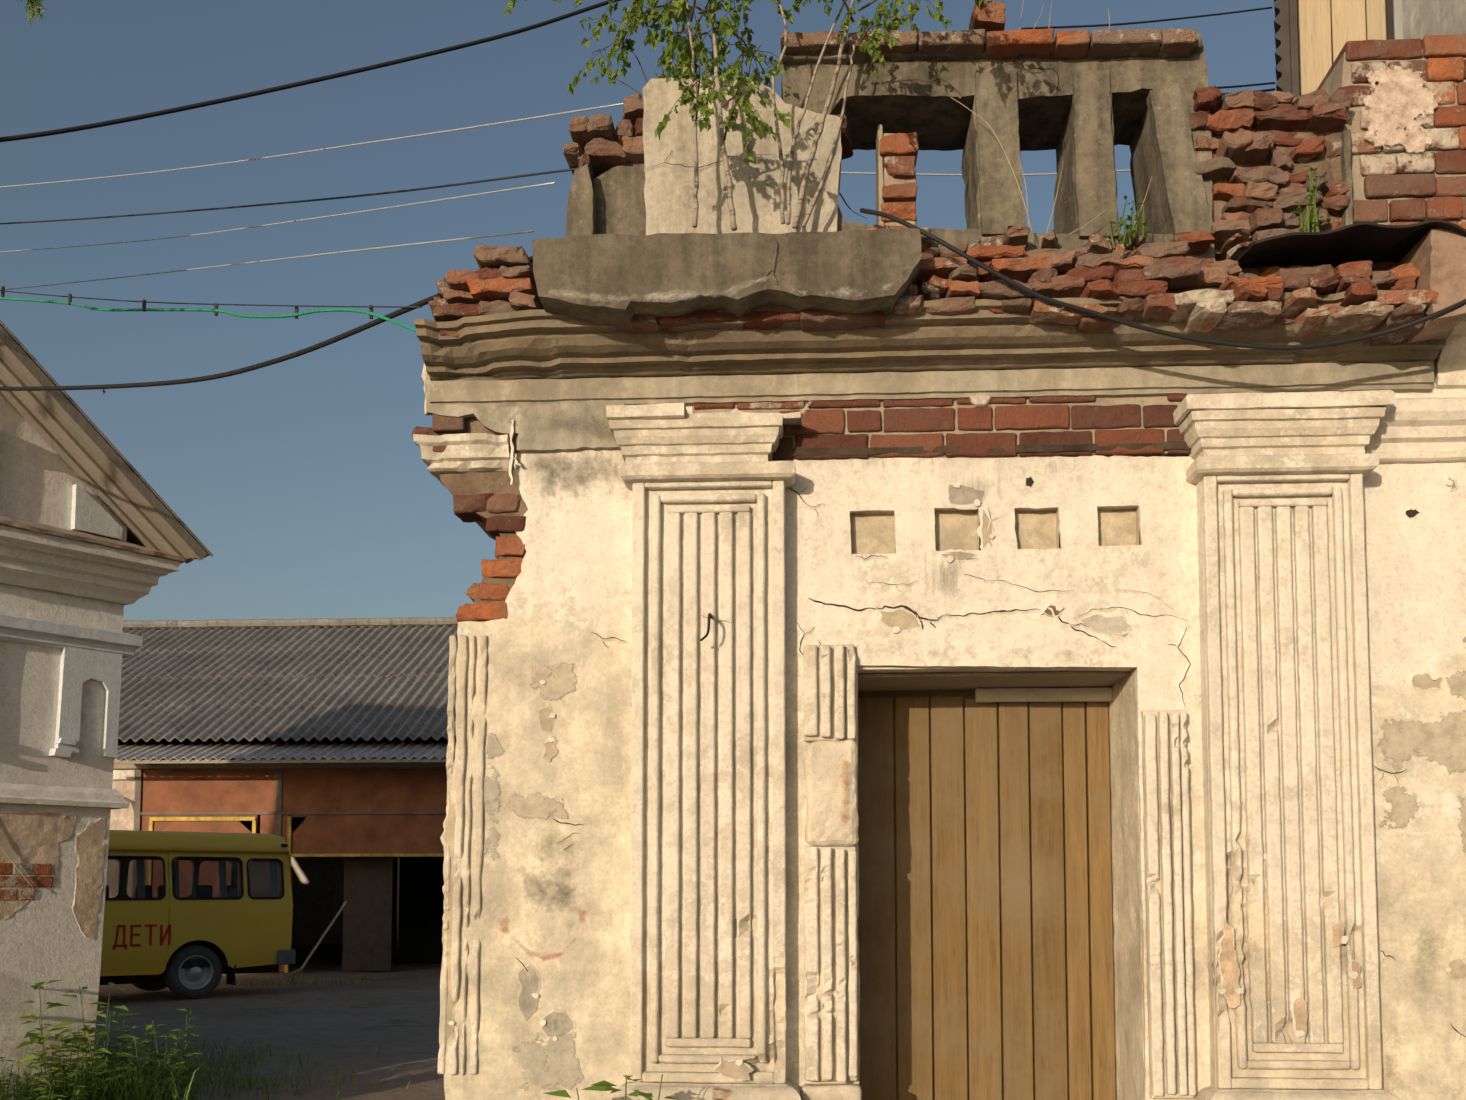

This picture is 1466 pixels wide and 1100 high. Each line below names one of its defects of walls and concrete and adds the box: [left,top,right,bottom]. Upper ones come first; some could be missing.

crack [795,508,1191,709]
flaking render [483,733,568,860]
flaking render [530,662,577,763]
flaking render [1378,671,1466,829]
flaking render [0,809,108,940]
flaking render [512,964,584,1091]
flaking render [1218,846,1270,1008]
flaking render [1291,996,1308,1038]
flaking render [1330,921,1362,992]